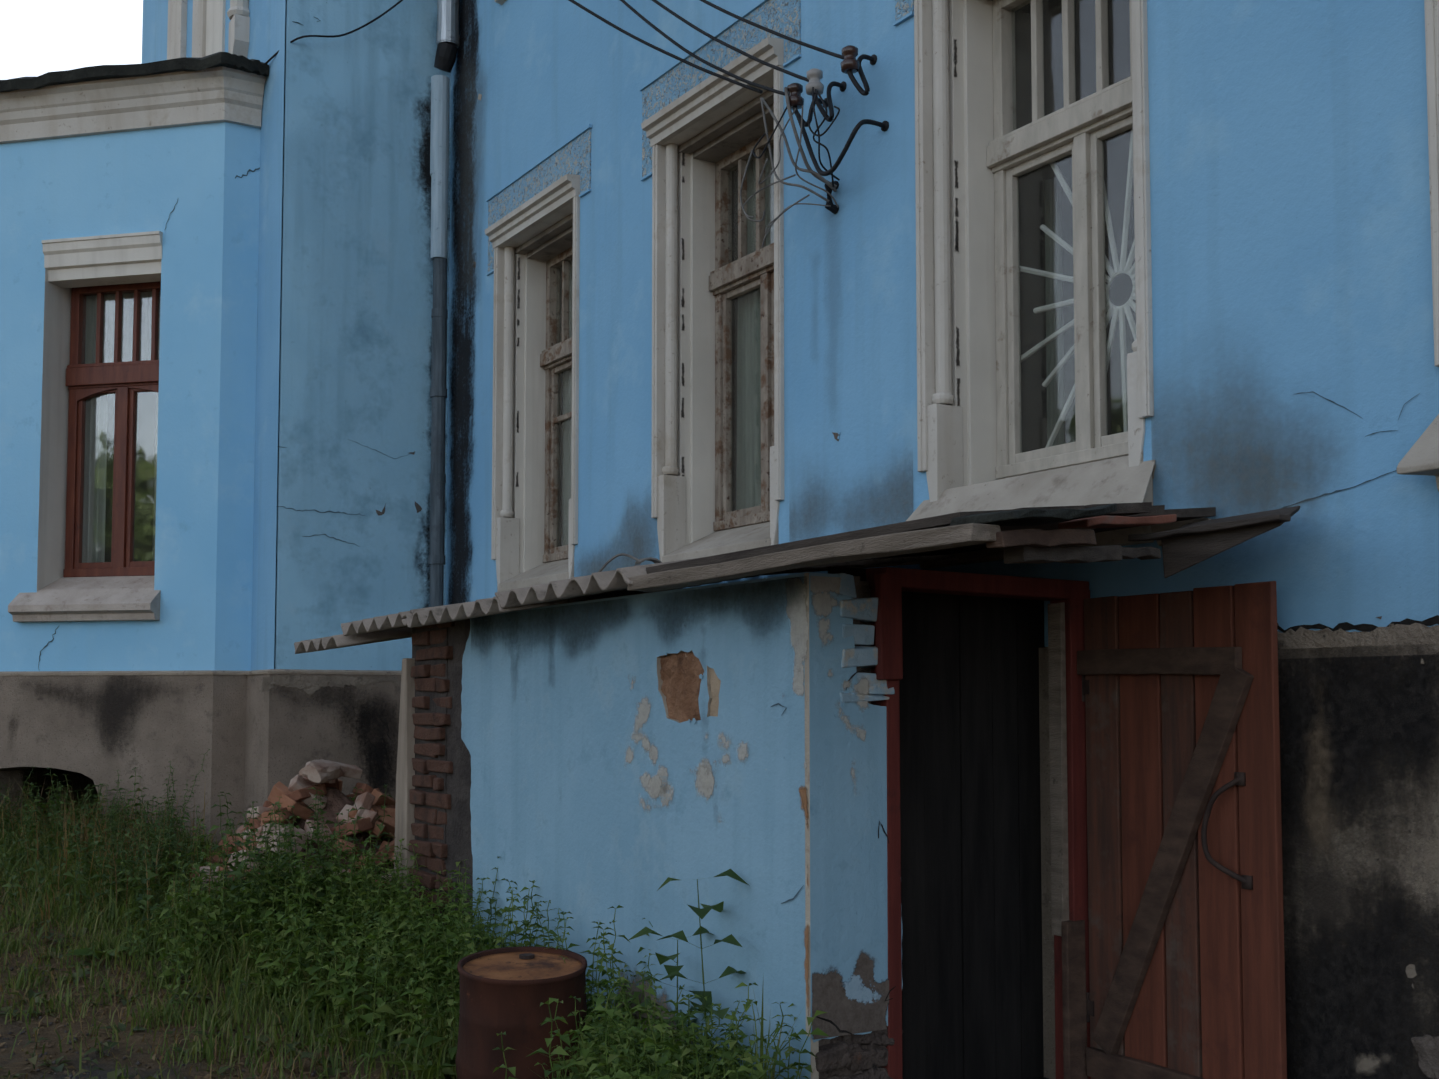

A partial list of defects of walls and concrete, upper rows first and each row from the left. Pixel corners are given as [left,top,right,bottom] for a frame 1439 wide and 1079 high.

crack [1294,391,1420,437]
crack [1280,470,1397,509]
crack [276,506,364,547]
water stain [416,498,446,608]
crack [1277,615,1439,633]
water stain [47,676,152,746]
spalling [626,651,748,809]
spalling [812,951,903,1079]